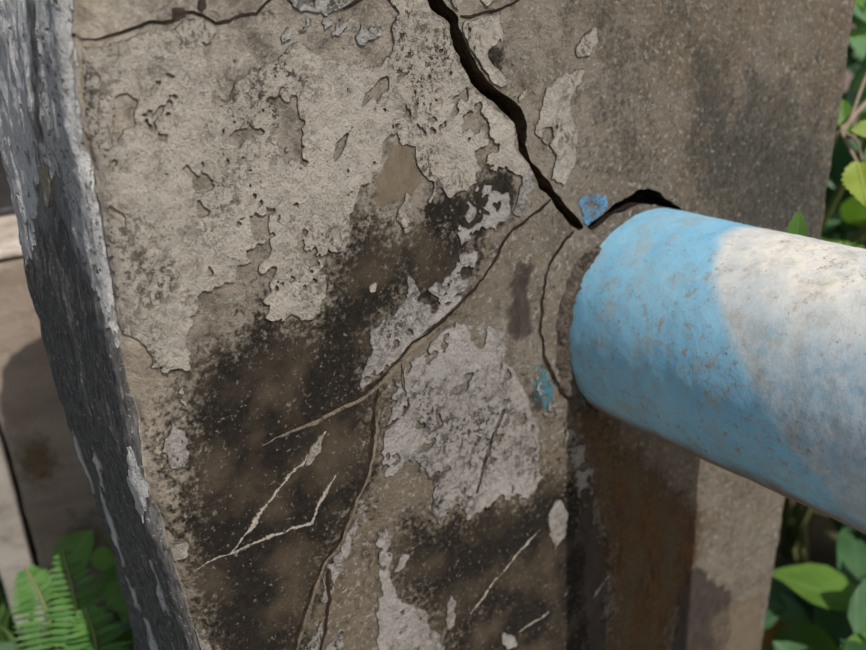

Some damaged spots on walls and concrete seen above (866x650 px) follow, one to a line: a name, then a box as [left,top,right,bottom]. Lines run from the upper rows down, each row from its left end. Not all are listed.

crack [37,0,271,43]
peeling [574,26,598,57]
leakage [23,138,518,650]
peeling [0,0,594,524]
crack [262,0,681,650]
leakage [508,263,533,339]
leakage [363,457,613,650]
peeling [548,500,568,549]